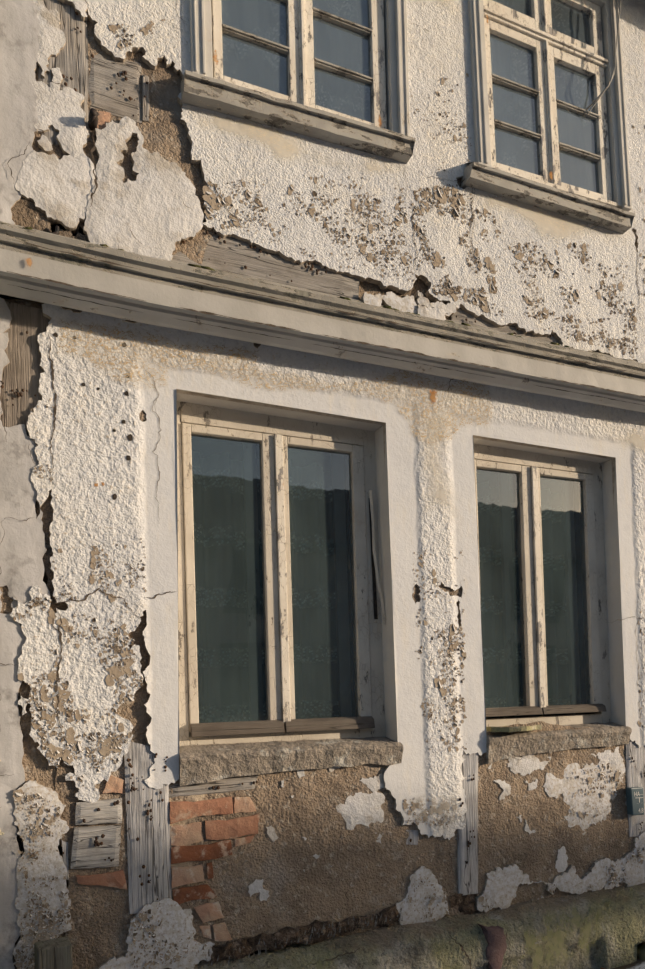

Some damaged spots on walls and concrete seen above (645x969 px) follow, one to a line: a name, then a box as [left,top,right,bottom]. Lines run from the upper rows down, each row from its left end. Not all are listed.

spalling [0,0,645,358]
crack [136,350,161,517]
crack [52,588,175,737]
spalling [0,464,467,969]
spalling [487,721,592,735]
spalling [474,744,645,912]